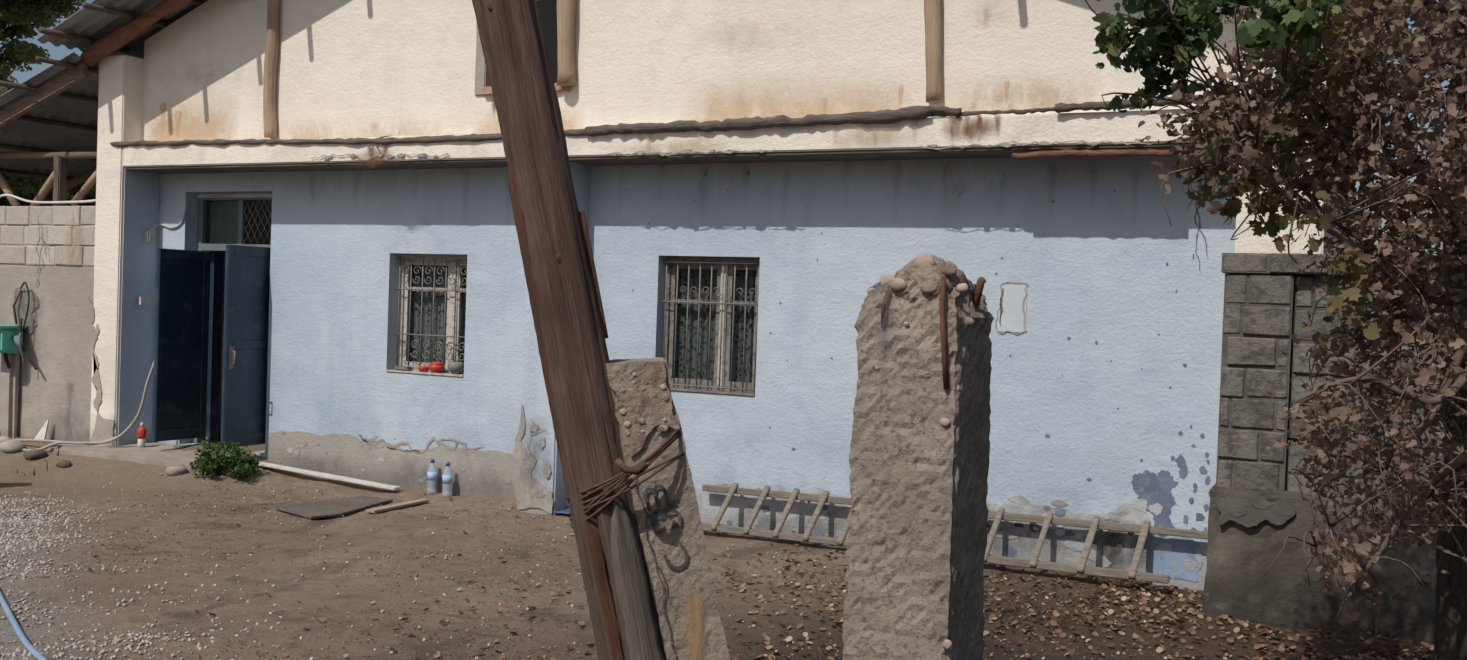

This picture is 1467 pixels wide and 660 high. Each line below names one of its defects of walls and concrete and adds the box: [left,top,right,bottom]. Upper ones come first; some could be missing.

water stain [708,98,882,122]
water stain [1032,89,1071,108]
spalling [268,404,554,514]
spalling [986,425,1296,583]